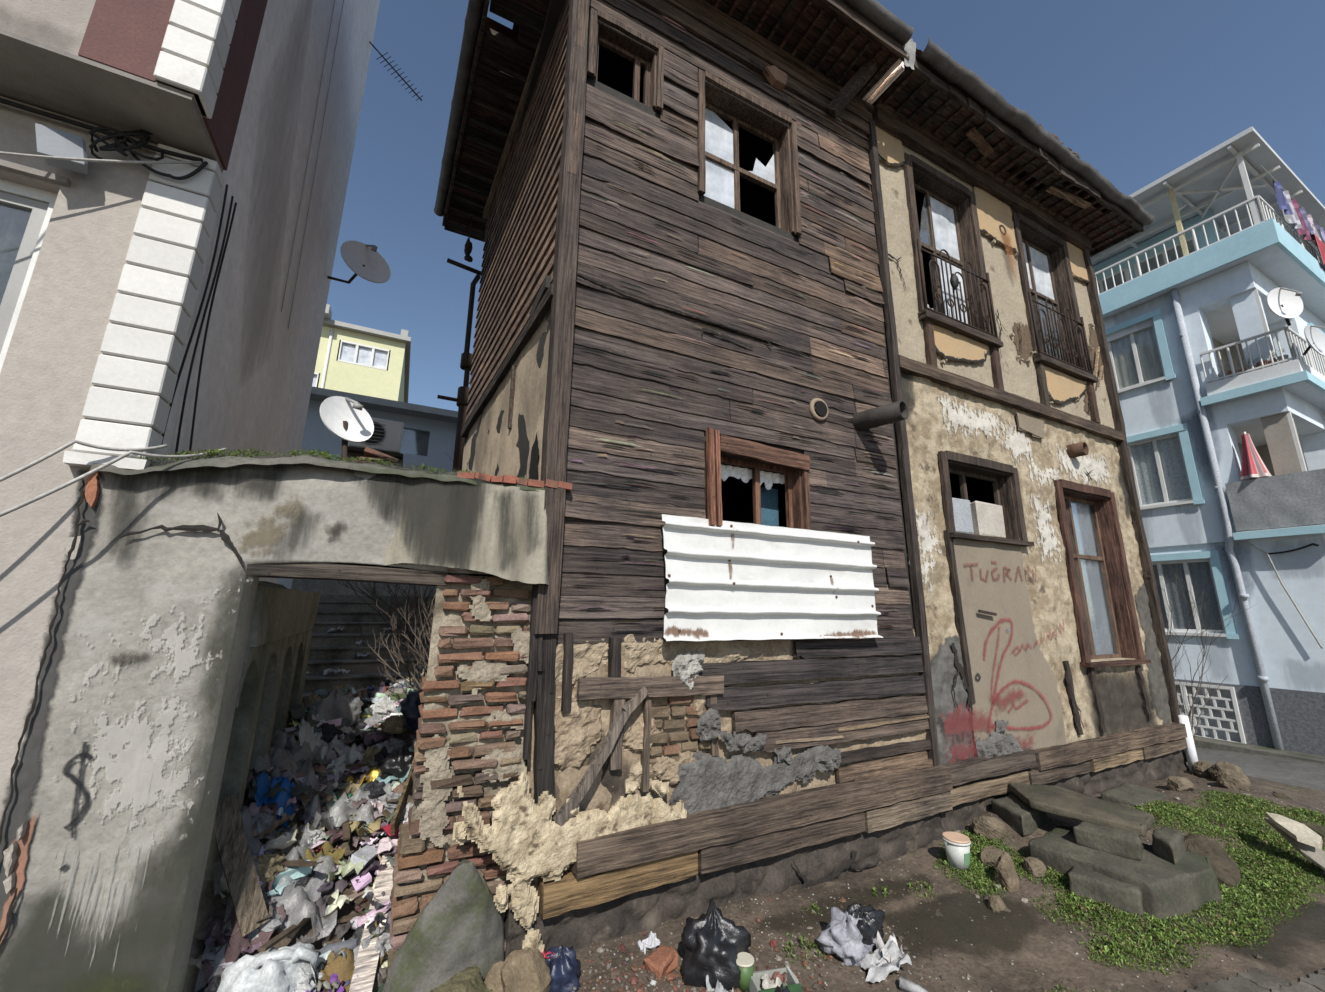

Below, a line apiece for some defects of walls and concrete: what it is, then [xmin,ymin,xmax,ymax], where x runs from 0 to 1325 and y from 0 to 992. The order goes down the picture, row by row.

flaking render [933,324,989,365]
flaking render [1009,322,1104,415]
damp [327,522,346,540]
damp [349,462,483,567]
damp [500,493,511,567]
peeling [916,508,942,591]
peeling [937,395,1114,563]
crack [0,470,243,921]
damp [205,574,244,722]
spalling [672,652,705,690]
peeling [48,580,248,981]
damp [0,743,219,992]